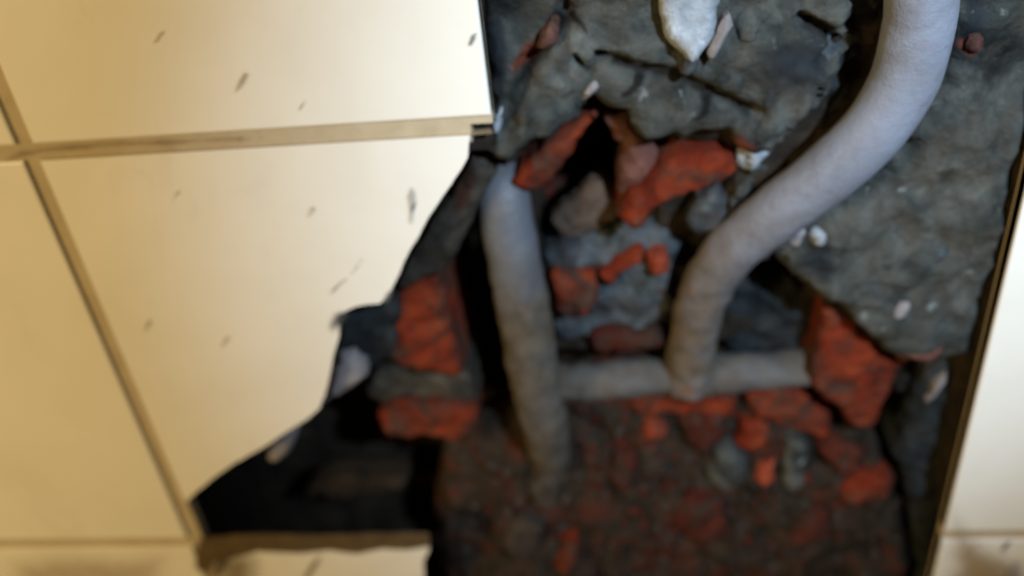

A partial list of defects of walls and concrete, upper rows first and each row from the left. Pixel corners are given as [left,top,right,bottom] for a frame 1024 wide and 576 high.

spalling [40,0,881,502]
spalling [626,0,1024,576]
spalling [207,532,430,576]
spalling [553,528,580,575]